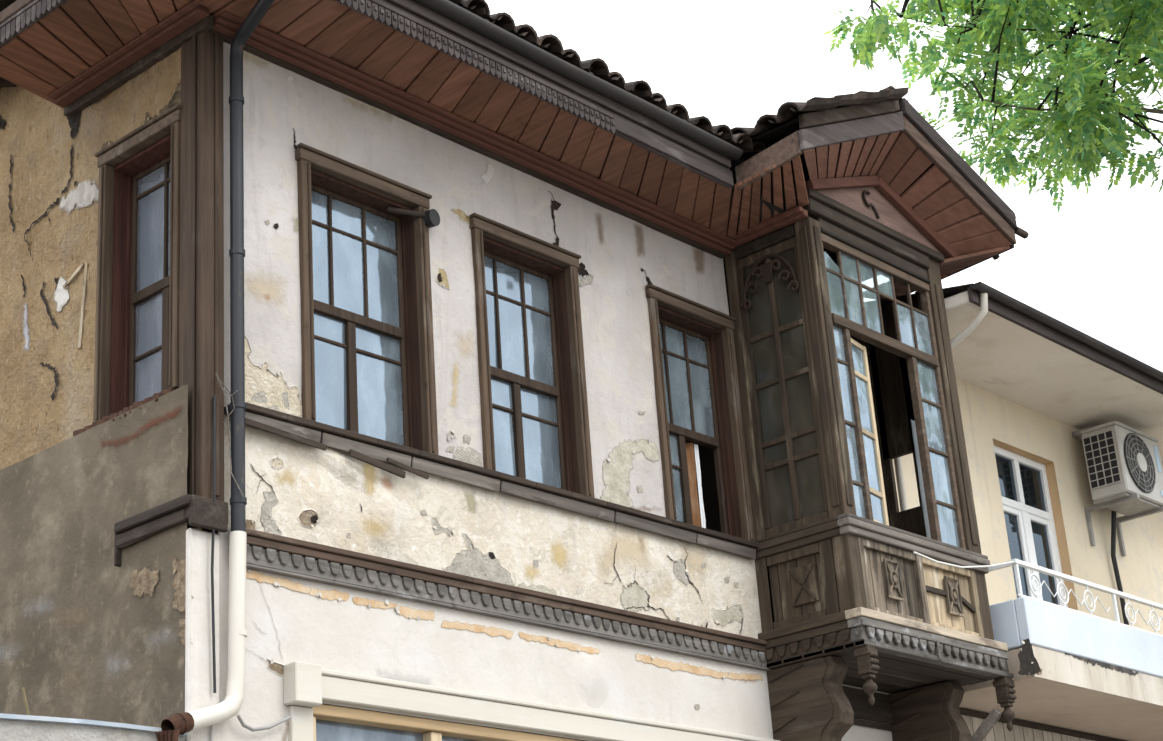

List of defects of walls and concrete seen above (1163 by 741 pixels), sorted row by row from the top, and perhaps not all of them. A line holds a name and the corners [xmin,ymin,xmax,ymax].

crack [8,109,77,329]
crack [548,191,562,247]
peeling [600,439,659,507]
spalling [130,557,193,645]
peeling [246,491,282,535]
spalling [297,508,321,529]
peeling [246,570,600,654]
peeling [421,510,557,595]
peeling [621,584,651,612]
peeling [673,558,691,586]